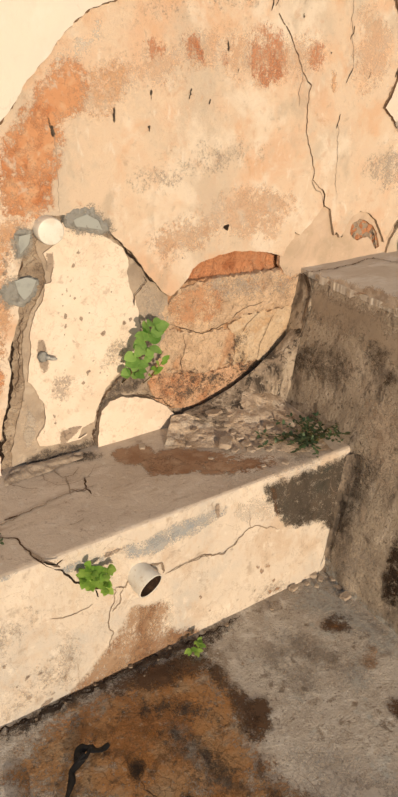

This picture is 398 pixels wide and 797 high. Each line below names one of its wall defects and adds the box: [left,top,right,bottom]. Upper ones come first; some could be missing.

crack [272,0,341,207]
peeling [37,340,49,373]
peeling [46,253,54,272]
crack [0,318,128,652]
peeling [60,426,82,444]
crack [91,368,179,442]
damp [154,329,258,401]
damp [26,399,398,537]
spalling [146,206,394,408]
crack [0,615,241,741]
damp [0,601,398,797]
damp [263,540,398,694]